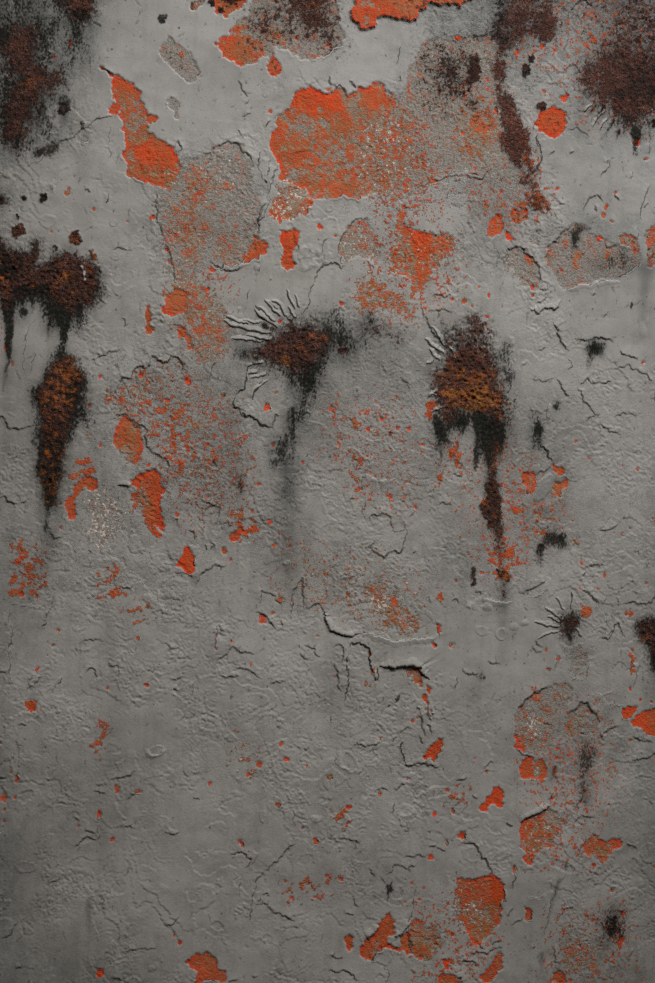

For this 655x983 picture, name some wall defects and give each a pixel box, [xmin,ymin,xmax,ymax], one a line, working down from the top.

corrosion [407,0,655,213]
corrosion [0,213,106,531]
corrosion [223,289,407,469]
peeling [59,33,655,648]
corrosion [425,309,516,596]
crack [429,580,548,609]
crack [259,577,492,831]
peeling [621,689,655,736]
peeling [344,912,459,983]
crack [346,842,522,982]
peeling [453,873,508,945]
crack [534,876,573,962]